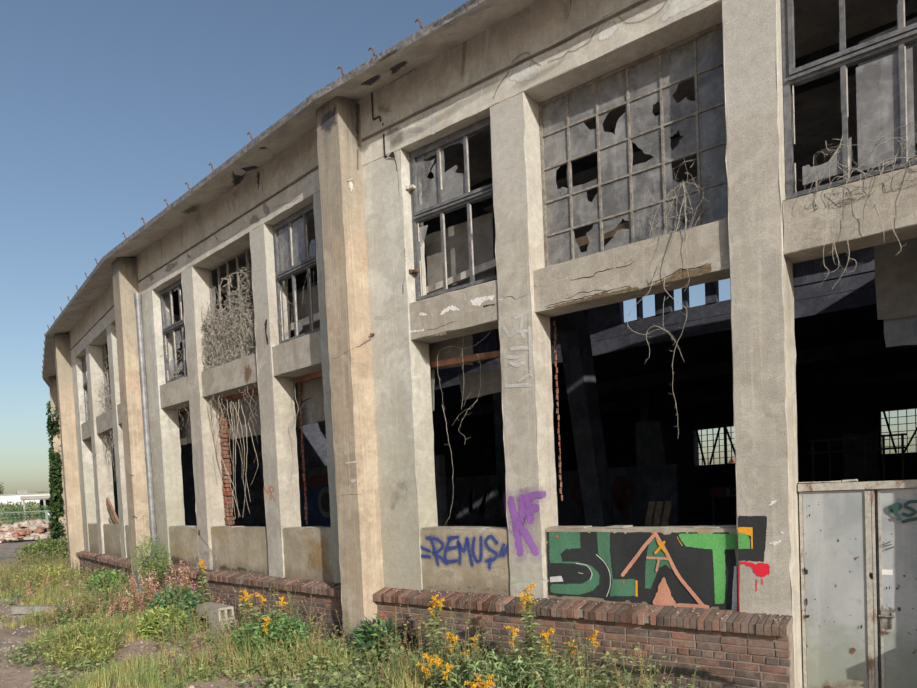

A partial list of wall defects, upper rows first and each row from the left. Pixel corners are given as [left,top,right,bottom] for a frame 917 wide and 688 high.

peeling [377,49,407,74]
crack [371,68,416,158]
peeling [440,293,495,315]
spalling [546,262,726,309]
flaking render [553,320,563,501]